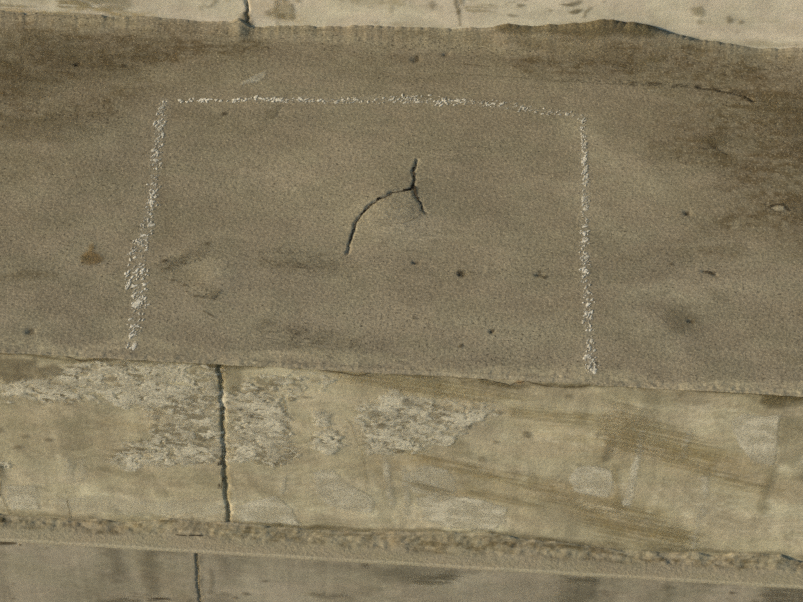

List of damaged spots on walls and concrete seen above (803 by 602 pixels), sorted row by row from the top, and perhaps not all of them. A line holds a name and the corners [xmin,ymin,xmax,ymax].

crack [348,162,424,251]
crack [218,365,229,520]